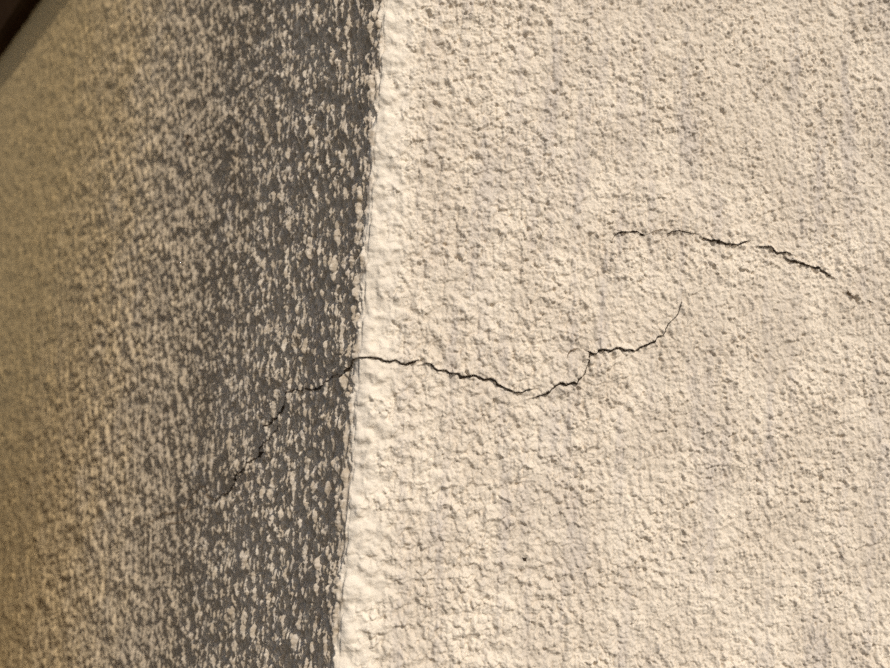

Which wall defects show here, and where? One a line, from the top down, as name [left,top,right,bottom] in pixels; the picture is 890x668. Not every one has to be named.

crack [612,228,871,303]
crack [143,300,682,526]